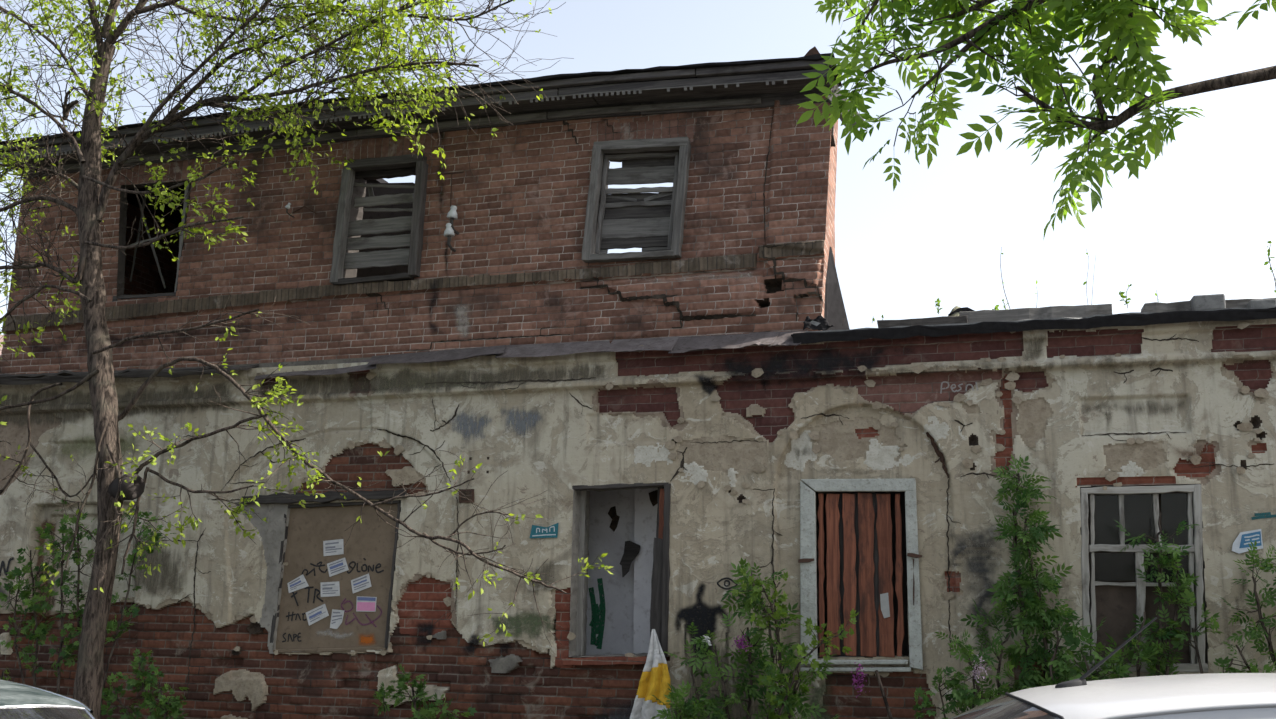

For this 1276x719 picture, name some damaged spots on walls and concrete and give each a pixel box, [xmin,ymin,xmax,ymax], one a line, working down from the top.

crack [761,115,822,321]
crack [578,278,756,328]
peeling [0,402,61,495]
spalling [289,437,429,495]
spalling [592,329,1144,505]
crack [926,420,995,657]
spalling [1075,322,1276,490]
spalling [0,606,82,698]
spalling [101,572,651,719]
spalling [665,652,680,684]